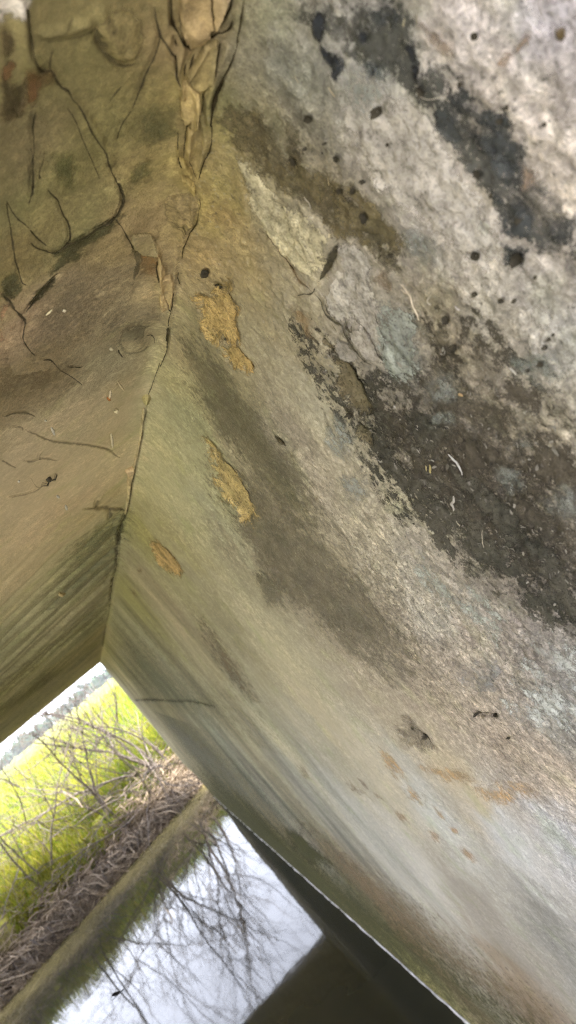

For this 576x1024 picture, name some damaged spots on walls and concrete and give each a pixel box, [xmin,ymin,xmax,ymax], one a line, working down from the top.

crack [3,0,244,646]
peeling [177,0,230,198]
spalling [190,270,254,376]
damp [372,6,401,31]
damp [342,71,542,273]
damp [528,0,576,32]
damp [548,220,573,245]
spalling [200,436,257,523]
damp [182,339,418,677]
damp [289,319,576,734]